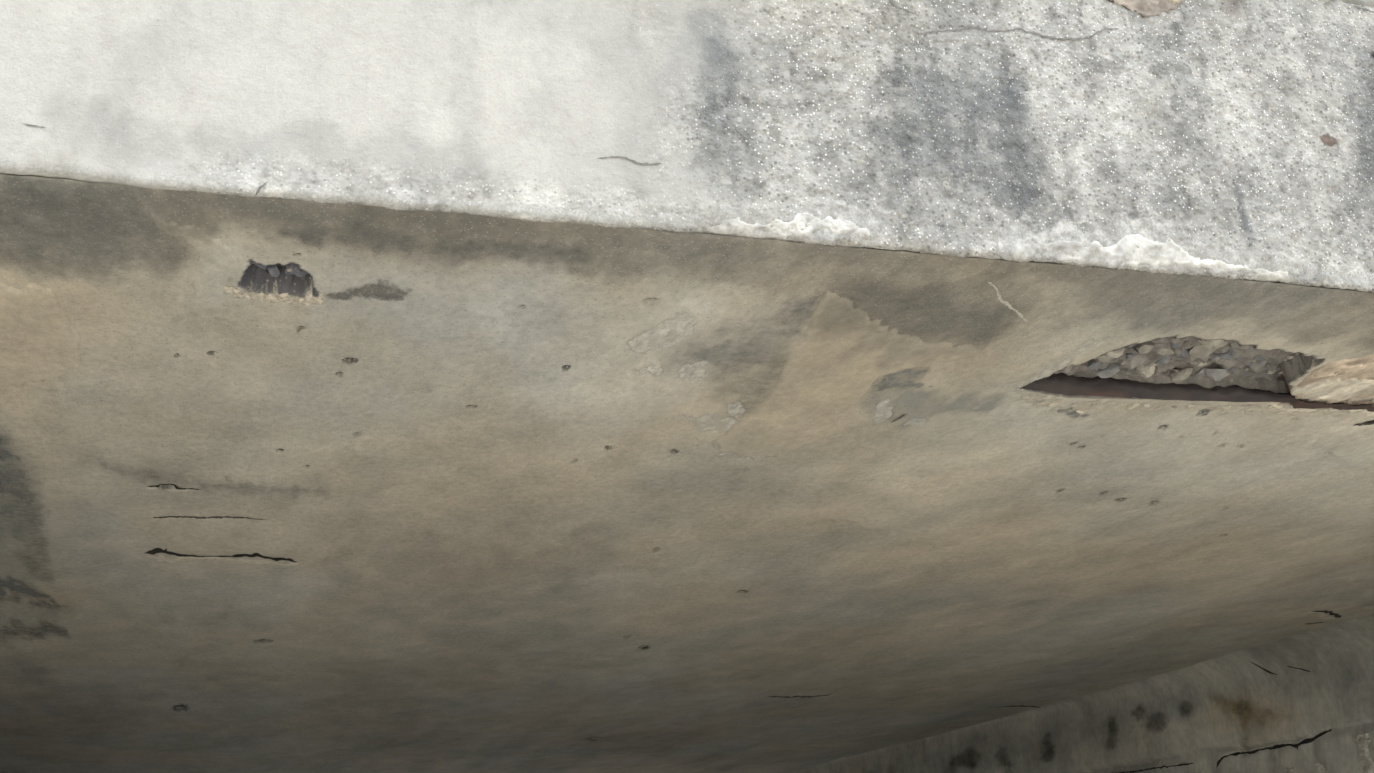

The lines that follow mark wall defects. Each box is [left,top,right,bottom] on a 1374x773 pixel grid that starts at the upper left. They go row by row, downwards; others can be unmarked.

crack [890,0,1145,47]
spalling [1111,0,1184,18]
peeling [150,213,406,306]
spalling [1019,336,1374,418]
crack [1268,377,1374,416]
crack [1112,727,1332,773]